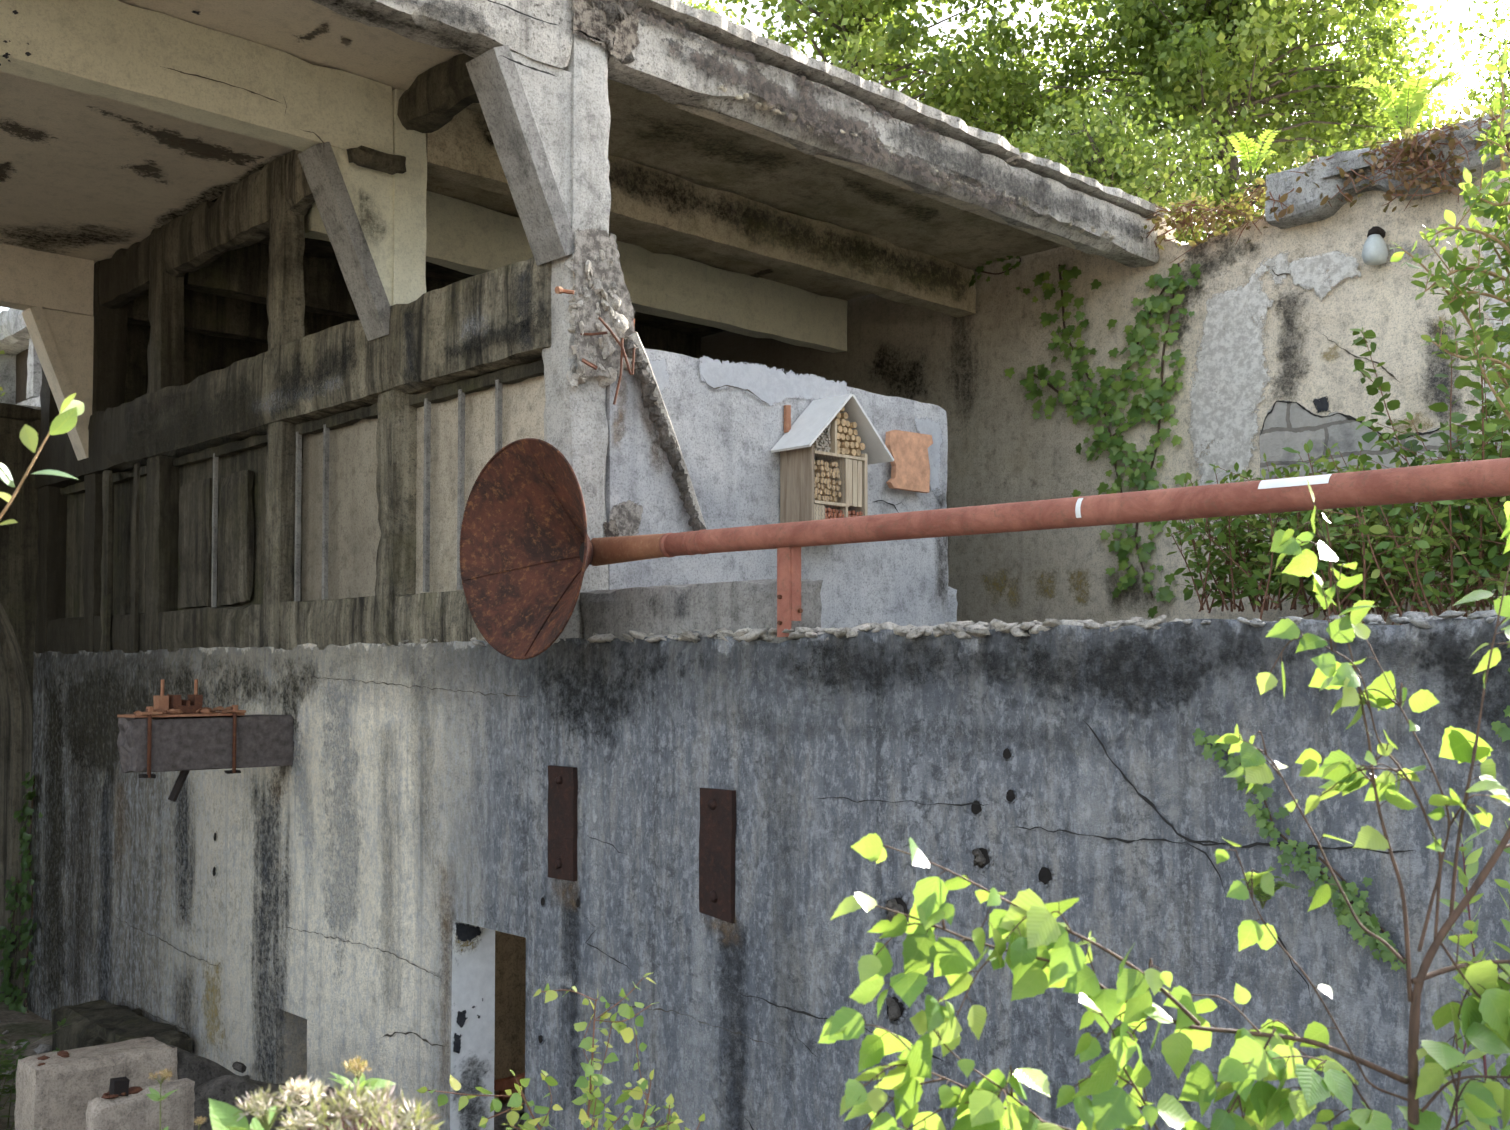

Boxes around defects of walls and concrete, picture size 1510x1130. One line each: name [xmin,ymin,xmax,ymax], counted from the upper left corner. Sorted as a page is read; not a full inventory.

damp [624,1,1149,242]
damp [0,225,130,252]
spalling [565,228,670,405]
peeling [699,356,847,406]
damp [609,163,977,399]
peeling [914,416,943,491]
peeling [1188,251,1471,486]
peeling [1477,239,1510,453]
damp [539,649,704,745]
damp [42,660,359,1083]
crack [817,797,989,806]
crack [1019,720,1413,892]